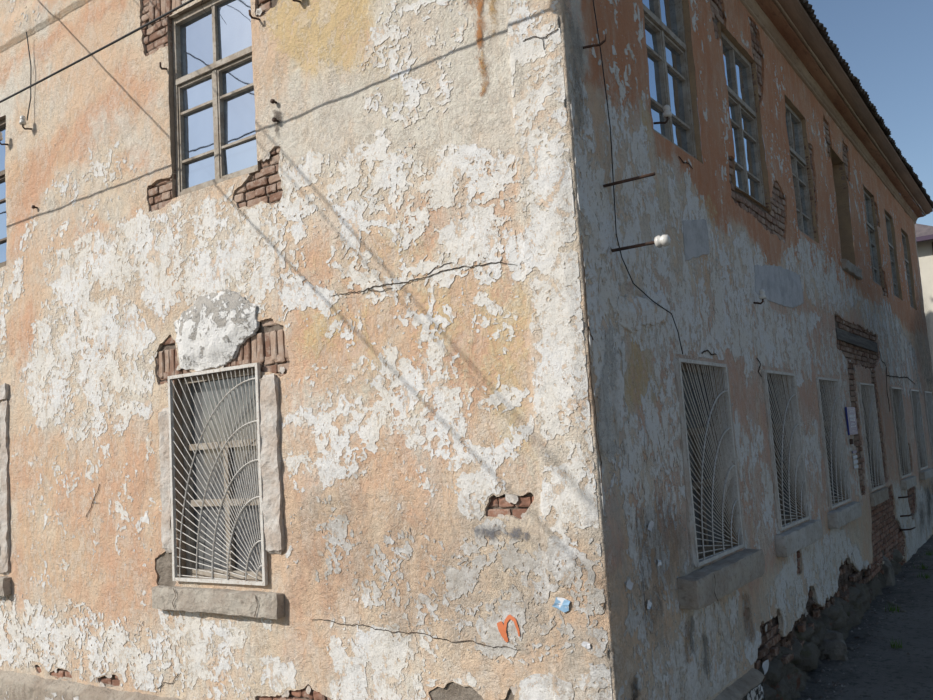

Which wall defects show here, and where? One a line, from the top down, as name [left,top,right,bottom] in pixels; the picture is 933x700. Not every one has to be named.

flaking render [141,0,190,56]
flaking render [256,0,278,17]
peeling [357,0,474,132]
corrosion [469,0,495,96]
flaking render [690,0,794,119]
flaking render [712,88,793,244]
crack [333,262,515,296]
crack [581,235,602,483]
peeling [106,457,176,606]
peeling [314,495,368,585]
peeling [0,593,253,700]
crack [311,619,518,650]